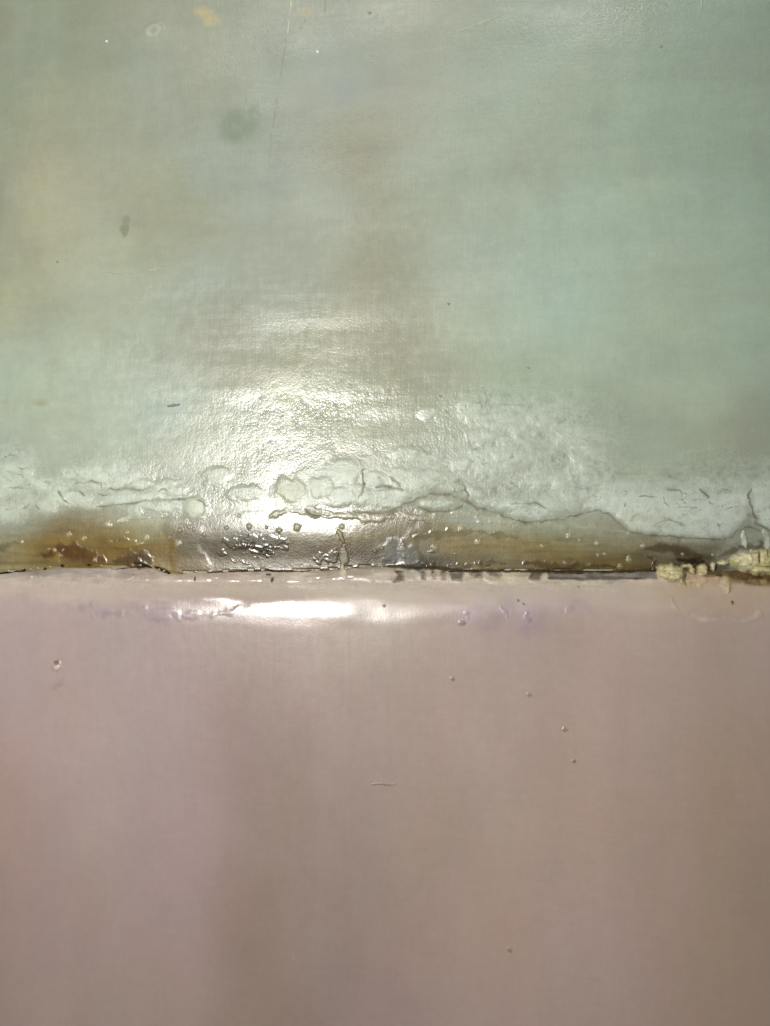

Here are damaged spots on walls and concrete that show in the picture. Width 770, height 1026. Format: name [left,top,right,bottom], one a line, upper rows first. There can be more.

crack [1,467,207,510]
damp [159,506,440,579]
crack [352,468,770,572]